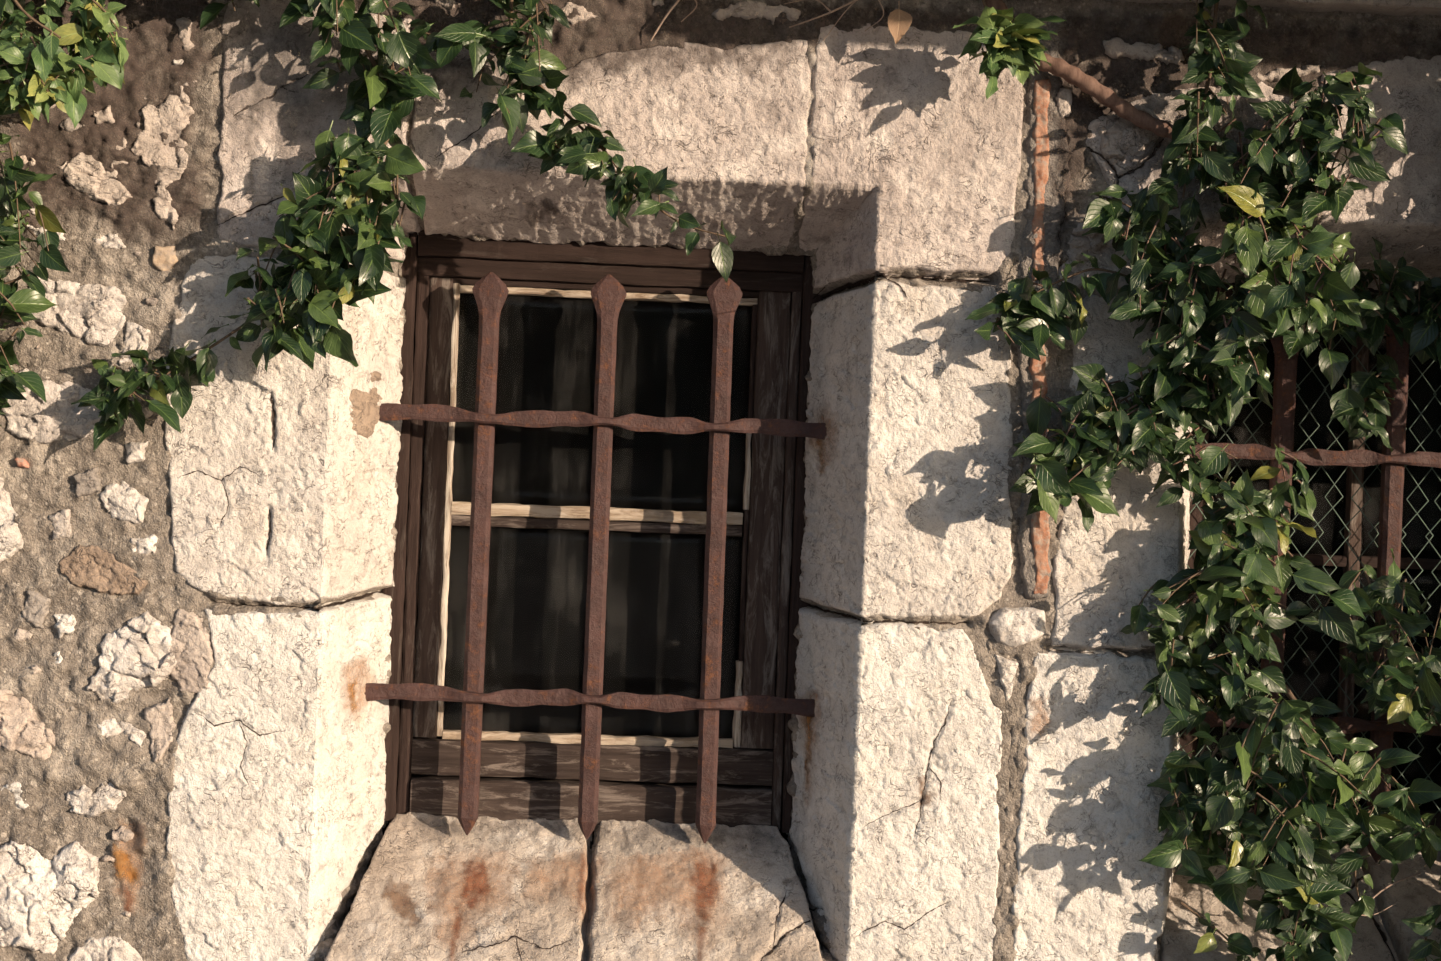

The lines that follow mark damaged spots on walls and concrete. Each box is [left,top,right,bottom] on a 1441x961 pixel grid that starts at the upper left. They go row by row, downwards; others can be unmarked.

peeling [173,17,194,65]
peeling [50,104,115,132]
peeling [111,81,197,231]
crack [178,395,275,525]
crack [264,509,272,550]
rust [347,663,366,712]
crack [864,701,952,833]
spalling [102,826,134,863]
rust [436,857,501,954]
rust [620,852,719,936]
crack [761,891,823,961]
crack [859,901,951,935]